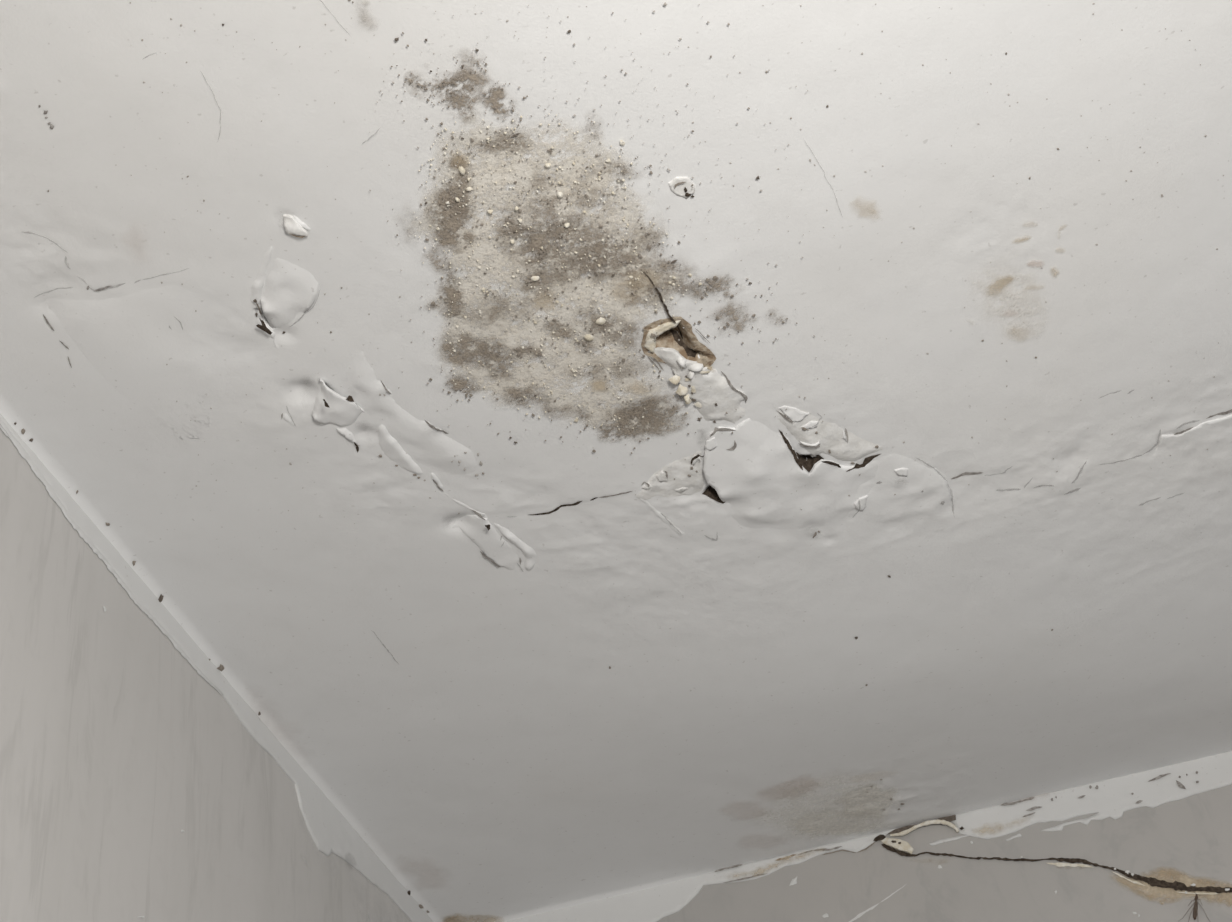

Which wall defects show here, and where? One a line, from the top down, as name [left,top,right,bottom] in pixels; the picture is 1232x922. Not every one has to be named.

mould [377,38,798,454]
peeling [251,246,320,349]
peeling [312,378,364,452]
peeling [636,317,883,529]
crack [1118,409,1232,462]
peeling [430,473,537,571]
crack [530,491,632,515]
crack [952,464,1085,494]
peeling [873,815,964,857]
crack [715,841,1232,895]